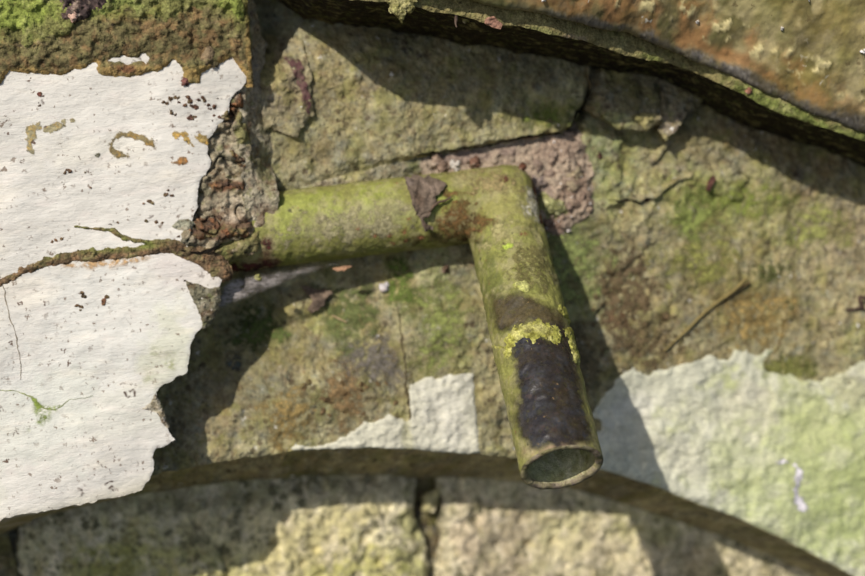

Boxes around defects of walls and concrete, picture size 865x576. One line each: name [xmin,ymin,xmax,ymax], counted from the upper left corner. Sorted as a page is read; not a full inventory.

peeling [0,0,314,263]
corrosion [161,95,221,122]
crack [418,100,585,156]
spalling [581,65,703,202]
corrosion [436,189,493,241]
crack [613,187,668,203]
corrosion [231,239,277,272]
crack [0,225,233,423]
spalling [184,280,221,329]
water stain [492,294,599,448]
spalling [142,394,170,429]
peeling [291,373,480,454]